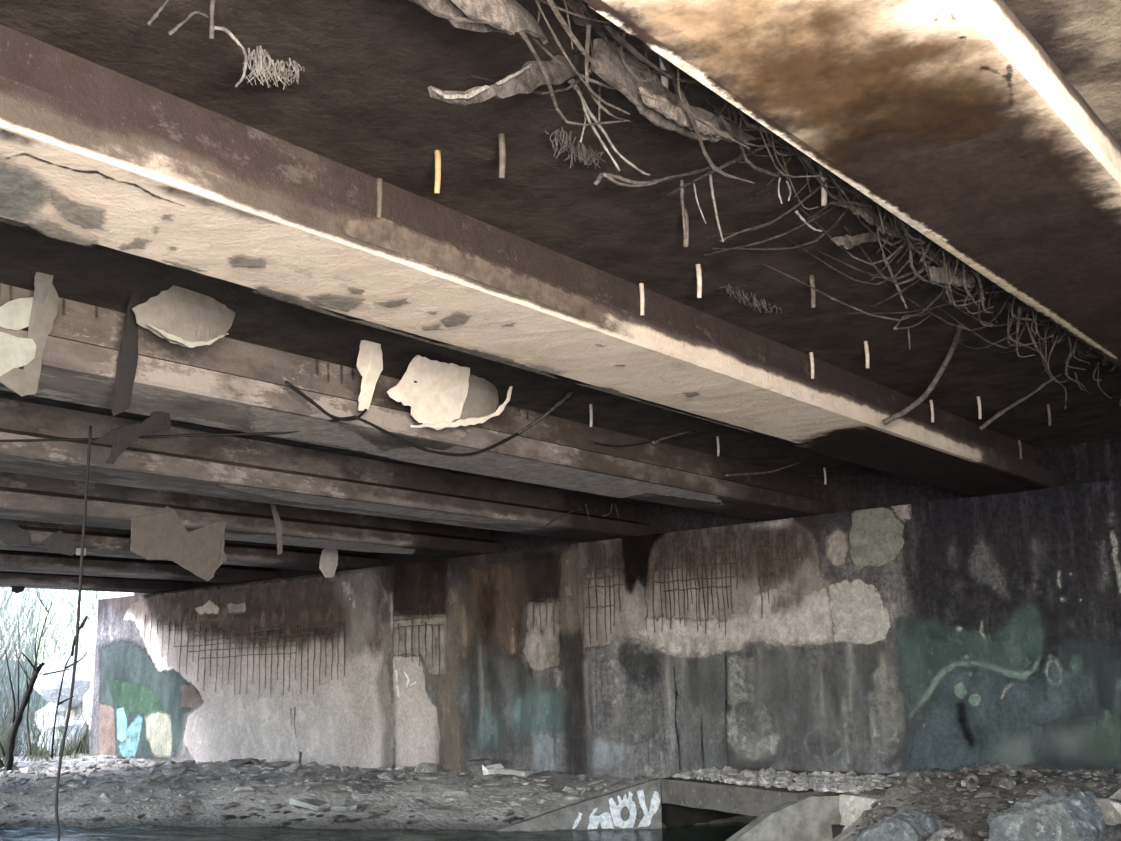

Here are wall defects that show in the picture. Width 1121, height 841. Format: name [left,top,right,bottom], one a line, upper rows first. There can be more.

crack [7,153,184,206]
spalling [120,214,173,250]
spalling [229,255,266,268]
peeling [0,272,59,397]
peeling [132,285,235,348]
peeling [248,286,723,504]
spalling [578,384,752,433]
spalling [576,504,910,659]
water stain [559,632,590,775]